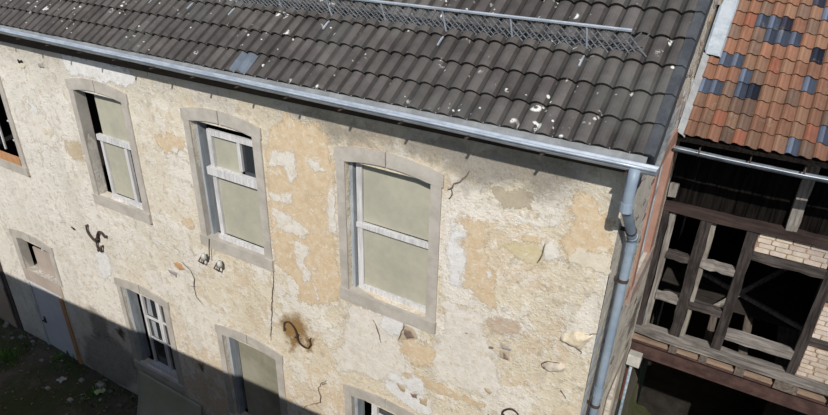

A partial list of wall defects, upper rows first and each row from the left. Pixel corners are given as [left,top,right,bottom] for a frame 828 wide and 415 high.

corrosion [281,316,313,351]
peeling [265,111,341,306]
peeling [331,215,520,415]
peeling [498,191,640,343]